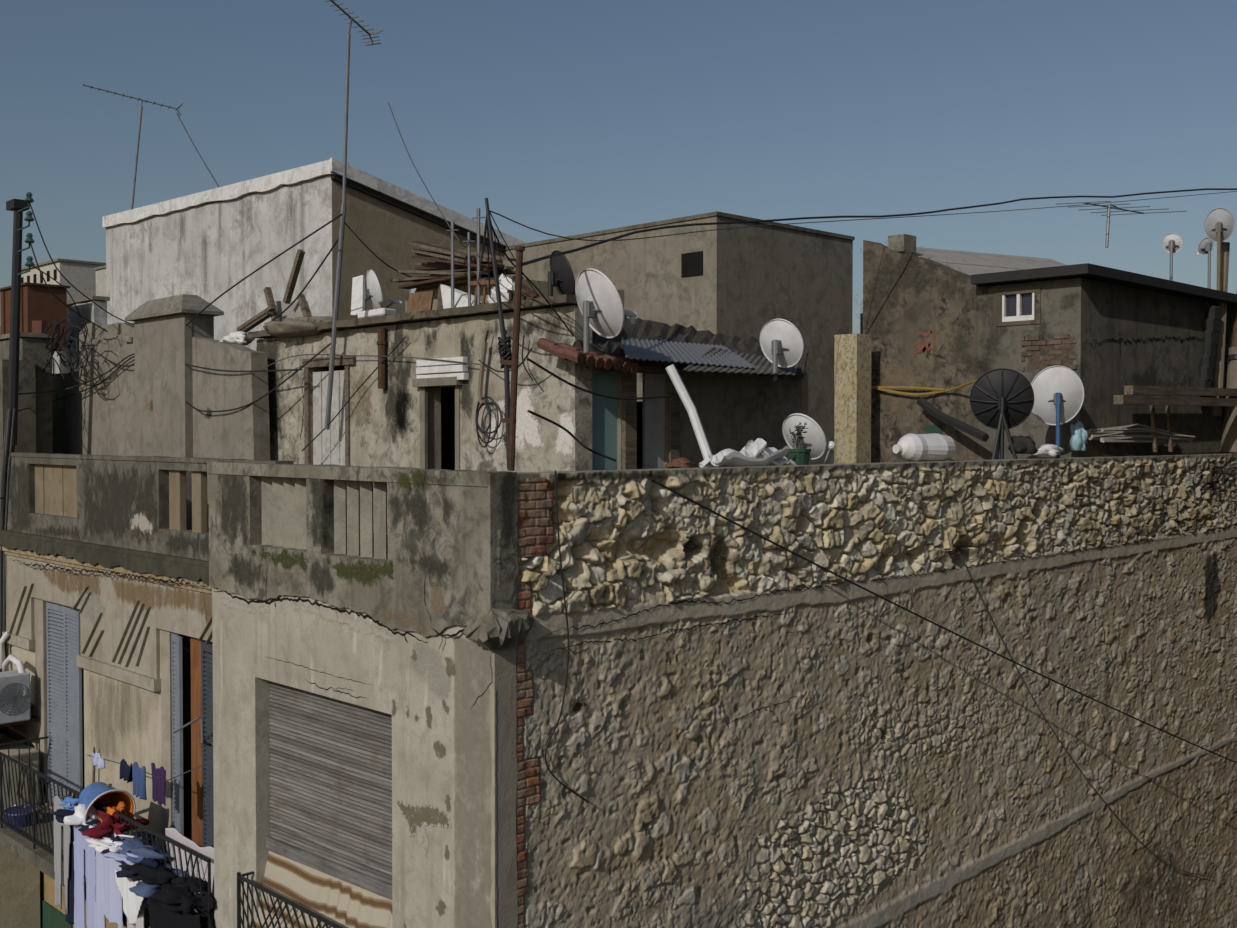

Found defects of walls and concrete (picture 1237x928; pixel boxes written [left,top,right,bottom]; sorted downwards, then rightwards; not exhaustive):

leakage [337,324,413,443]
peeling [488,386,576,457]
mould [9,463,209,557]
mould [218,460,265,584]
leakage [310,478,324,545]
crack [11,558,465,649]
leakage [310,562,333,595]
crack [545,536,1179,655]
spalling [392,699,449,728]
spalling [433,741,446,757]
spalling [396,795,452,856]